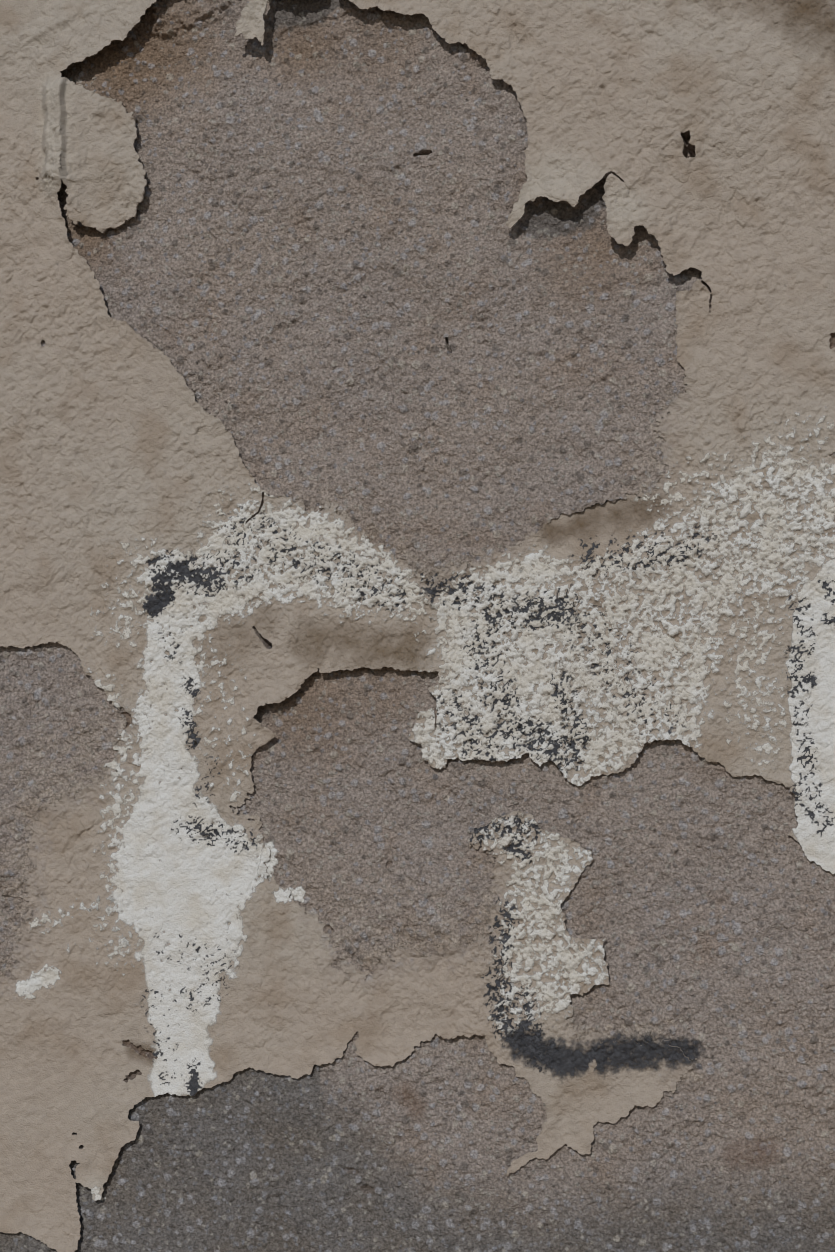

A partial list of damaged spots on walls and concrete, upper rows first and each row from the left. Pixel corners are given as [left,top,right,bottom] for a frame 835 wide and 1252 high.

peeling [49,0,702,582]
peeling [0,1232,57,1252]
peeling [0,642,133,980]
peeling [69,667,835,1252]